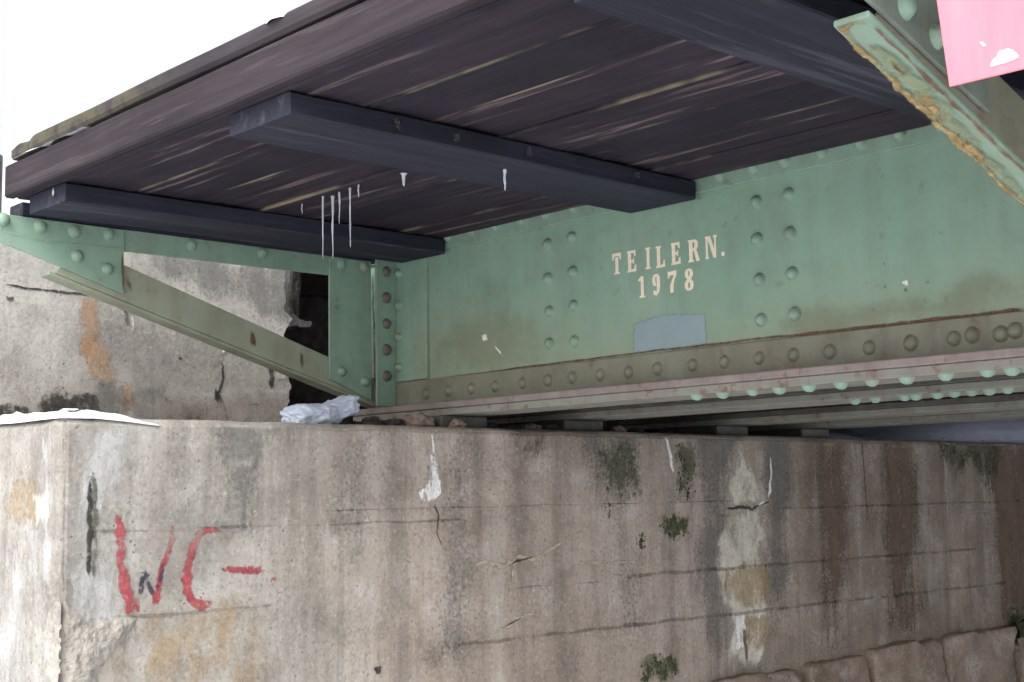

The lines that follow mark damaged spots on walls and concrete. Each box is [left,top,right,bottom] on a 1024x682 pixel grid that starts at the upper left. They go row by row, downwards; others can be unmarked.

corrosion [837,24,1024,206]
corrosion [79,298,112,385]
crack [215,362,260,420]
crack [475,525,590,633]
crack [728,502,768,510]
water stain [816,442,934,630]